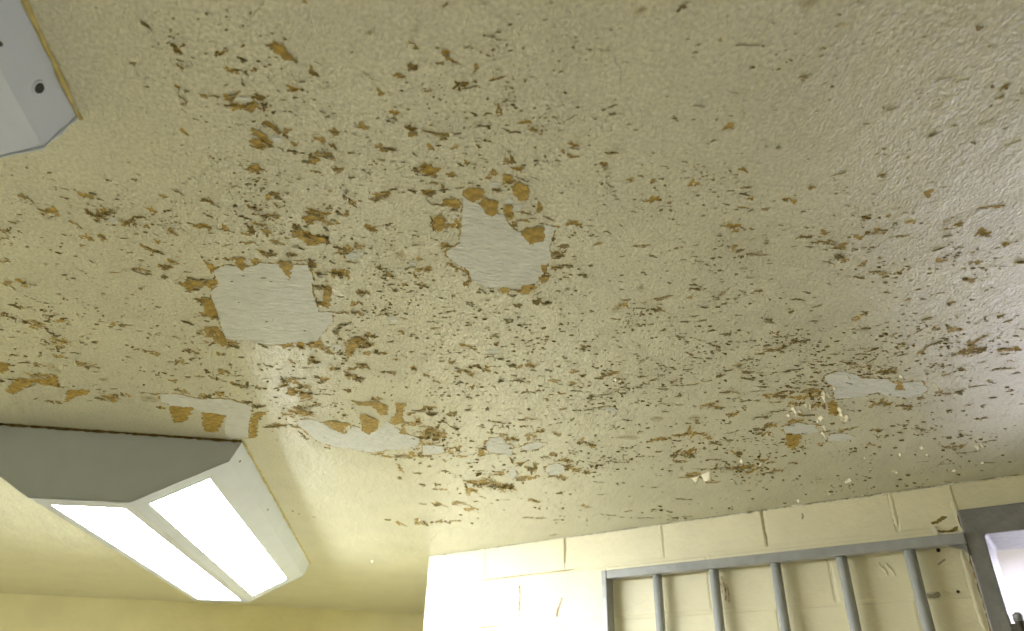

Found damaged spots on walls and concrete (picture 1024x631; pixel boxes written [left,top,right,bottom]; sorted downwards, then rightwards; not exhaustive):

peeling [0,30,1024,526]